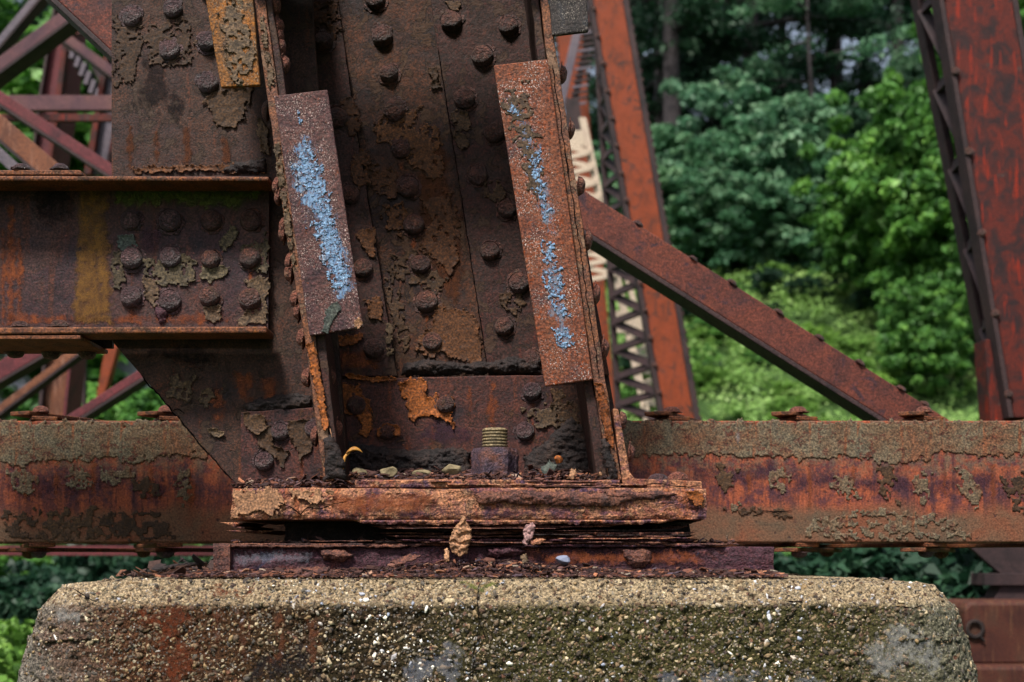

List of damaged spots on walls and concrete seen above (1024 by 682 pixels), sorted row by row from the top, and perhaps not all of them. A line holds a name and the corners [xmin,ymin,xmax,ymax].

peeling [111,14,144,88]
peeling [202,0,275,128]
corrosion [0,191,141,325]
peeling [131,162,237,175]
peeling [142,253,230,308]
peeling [219,225,271,327]
peeling [306,104,483,438]
corrosion [411,139,465,302]
peeling [0,418,225,543]
peeling [231,411,607,519]
peeling [594,382,1024,544]